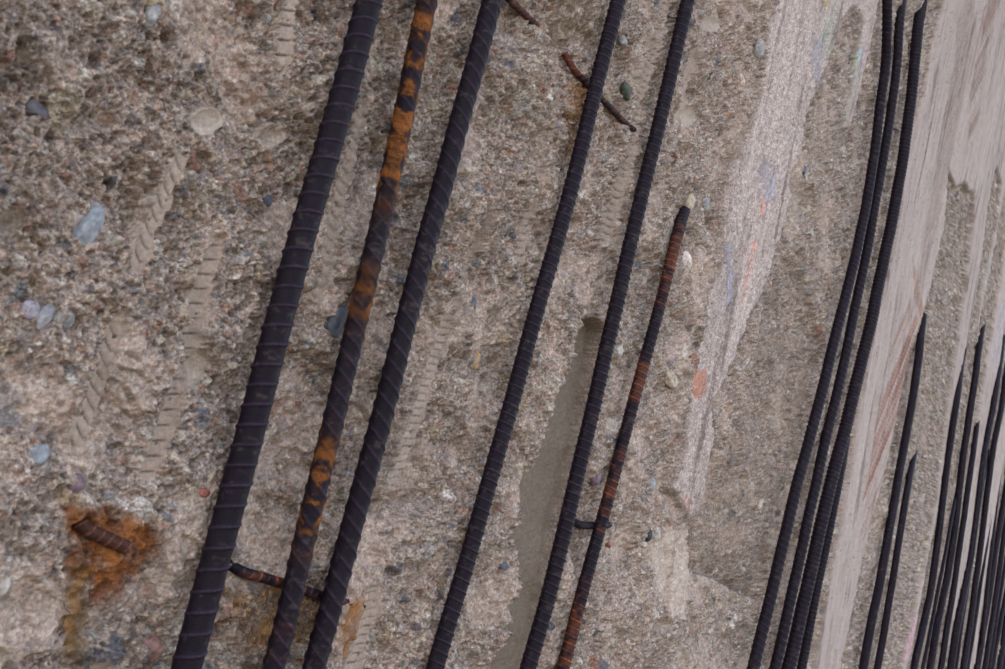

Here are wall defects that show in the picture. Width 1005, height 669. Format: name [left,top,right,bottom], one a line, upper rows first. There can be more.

rust [64,506,159,641]
rust [247,586,282,648]
spalling [0,0,610,669]
spalling [425,0,943,669]